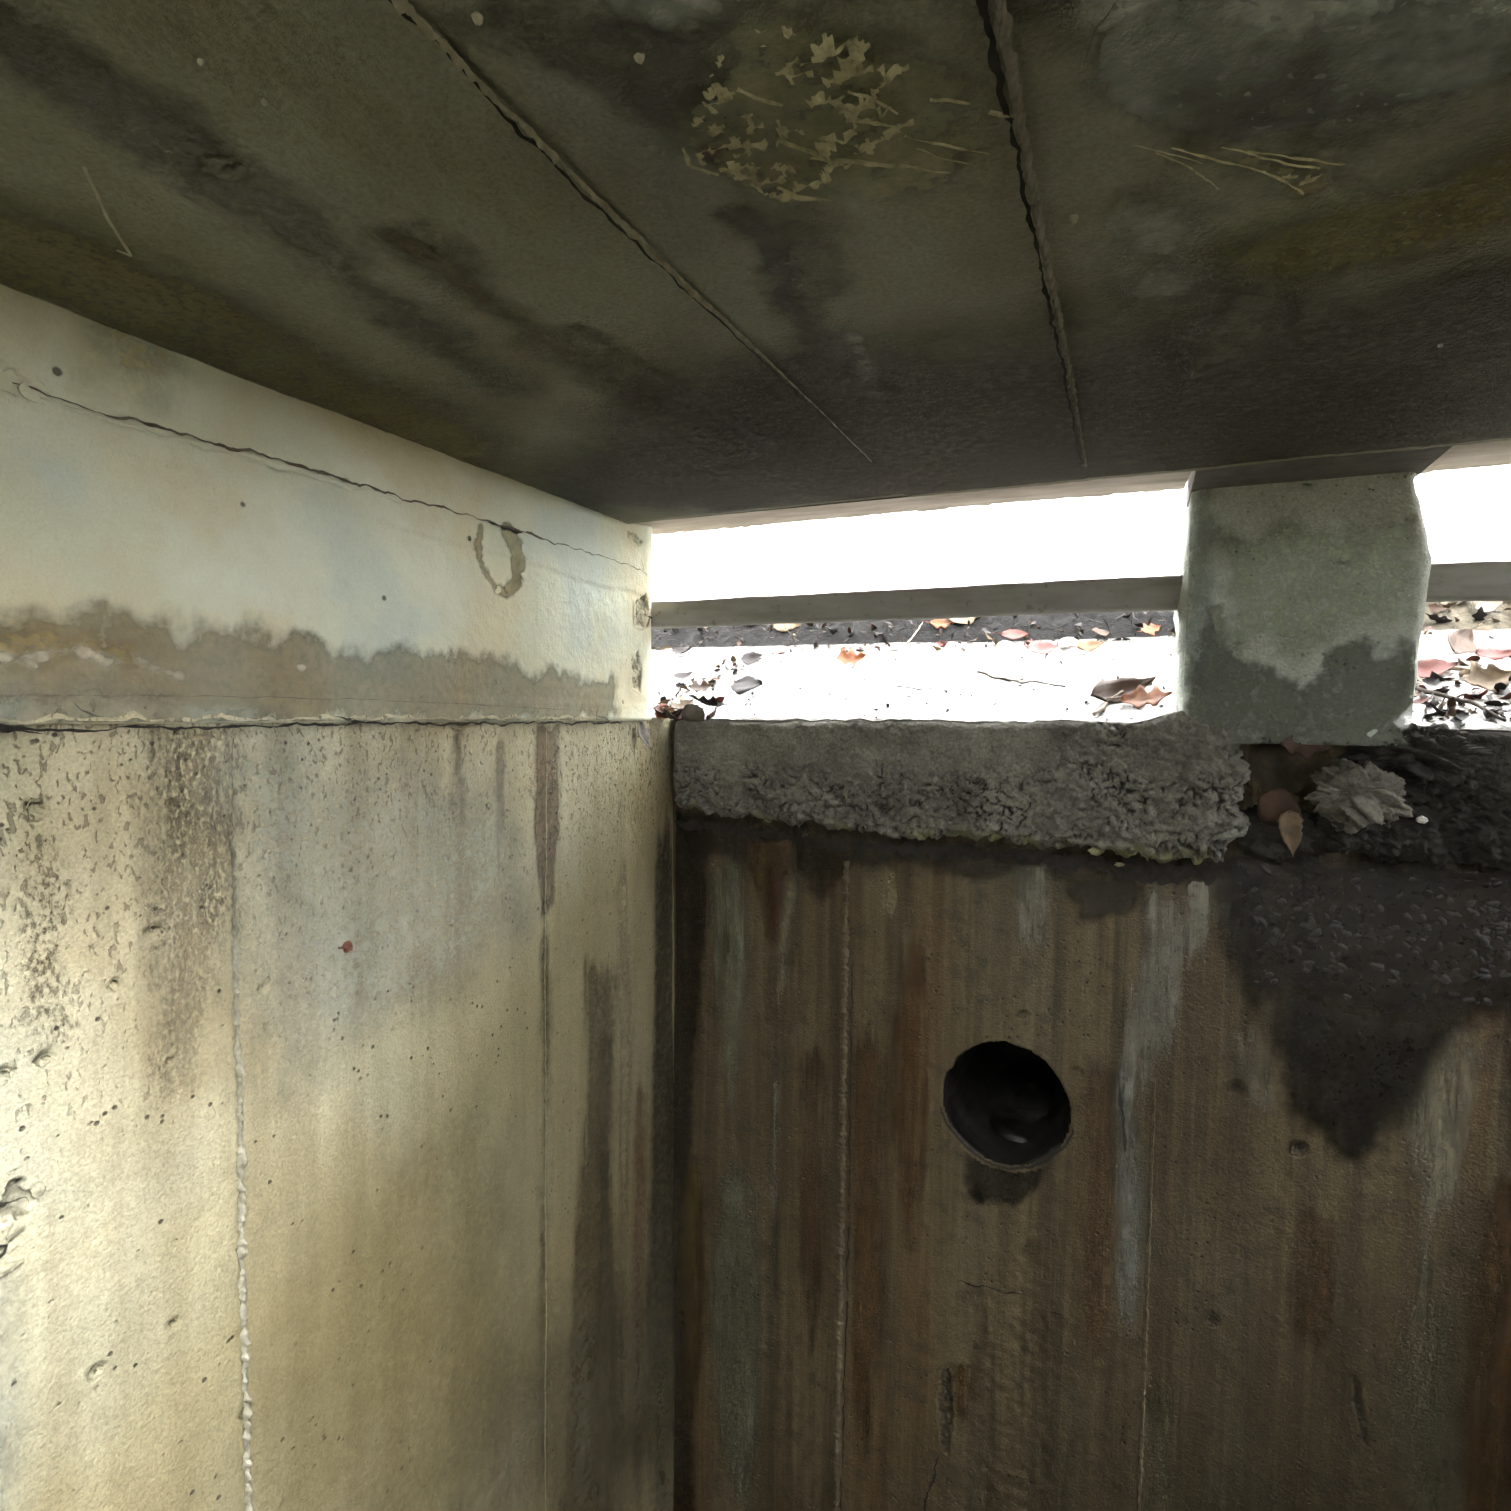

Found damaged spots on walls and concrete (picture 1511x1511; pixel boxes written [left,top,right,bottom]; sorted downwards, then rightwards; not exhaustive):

water stain [0,1,525,391]
crack [12,382,653,623]
peeling [475,522,529,598]
water stain [1185,489,1416,746]
water stain [0,600,617,1077]
spalling [0,1166,47,1277]
water stain [528,960,670,1511]
water stain [679,814,1511,1511]